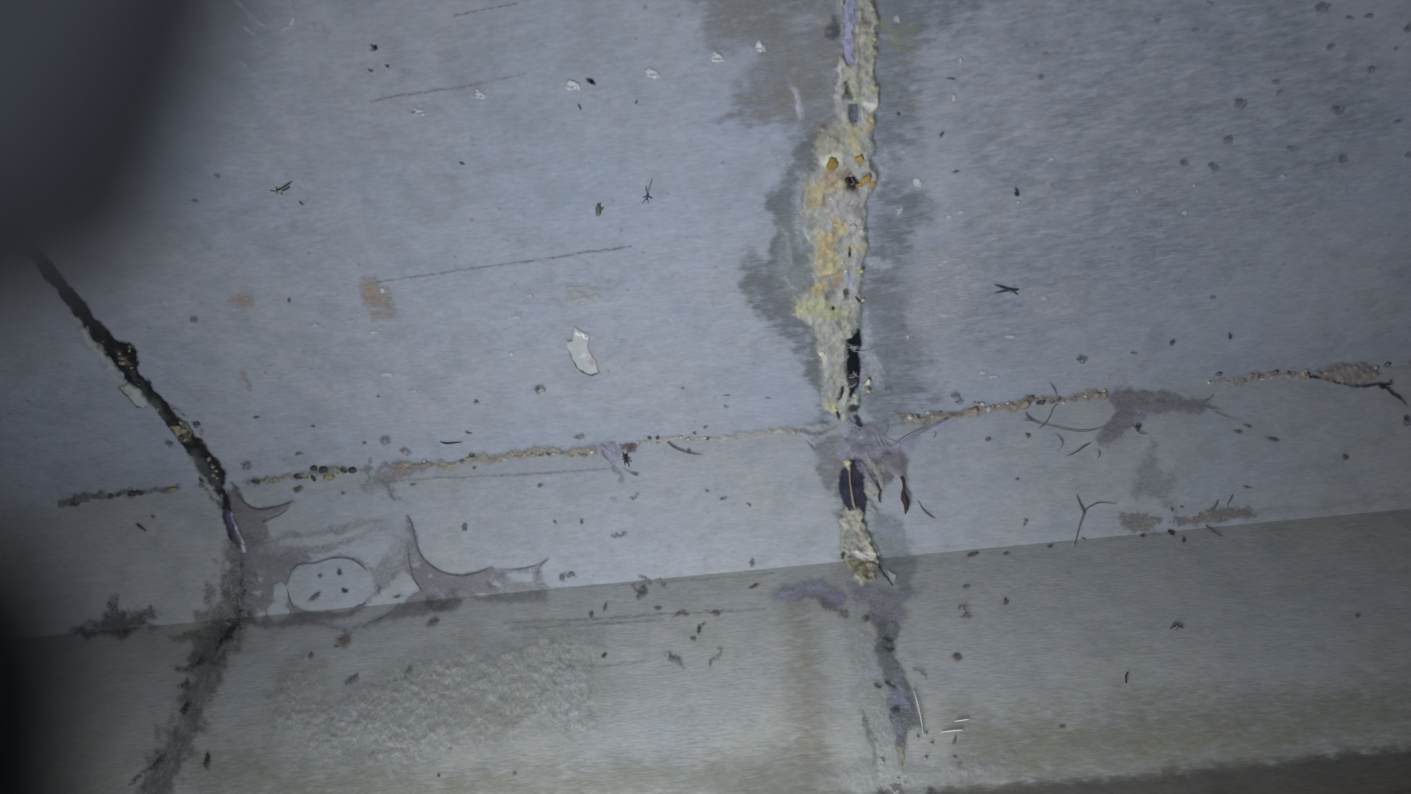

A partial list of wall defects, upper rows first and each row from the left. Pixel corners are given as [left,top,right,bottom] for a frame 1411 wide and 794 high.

crack [836,328,884,513]
leakage [446,0,1411,794]
crack [1301,376,1406,405]
crack [64,294,258,794]
crack [861,613,933,794]